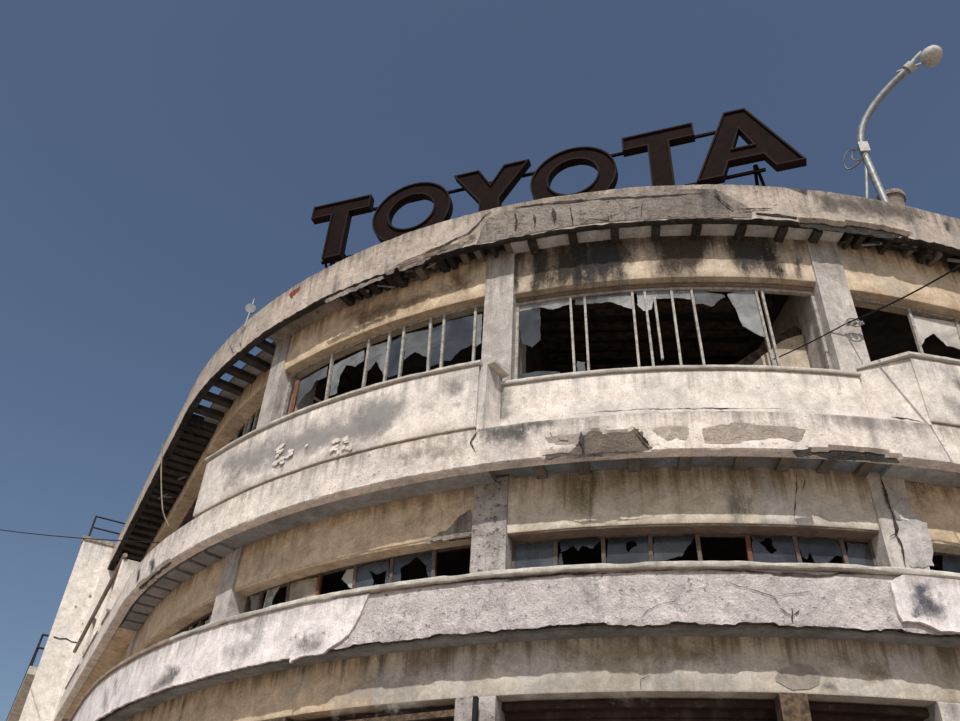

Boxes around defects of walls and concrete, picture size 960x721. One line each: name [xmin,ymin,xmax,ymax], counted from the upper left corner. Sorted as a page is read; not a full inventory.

crack [514,191,772,231]
crack [396,212,491,266]
water stain [514,239,631,297]
water stain [646,235,709,276]
water stain [723,236,784,277]
spalling [545,426,689,460]
spalling [702,422,900,463]
crack [880,475,906,567]
crack [417,569,871,622]
peeling [889,574,960,634]
water stain [912,585,945,617]
peeling [72,593,371,721]